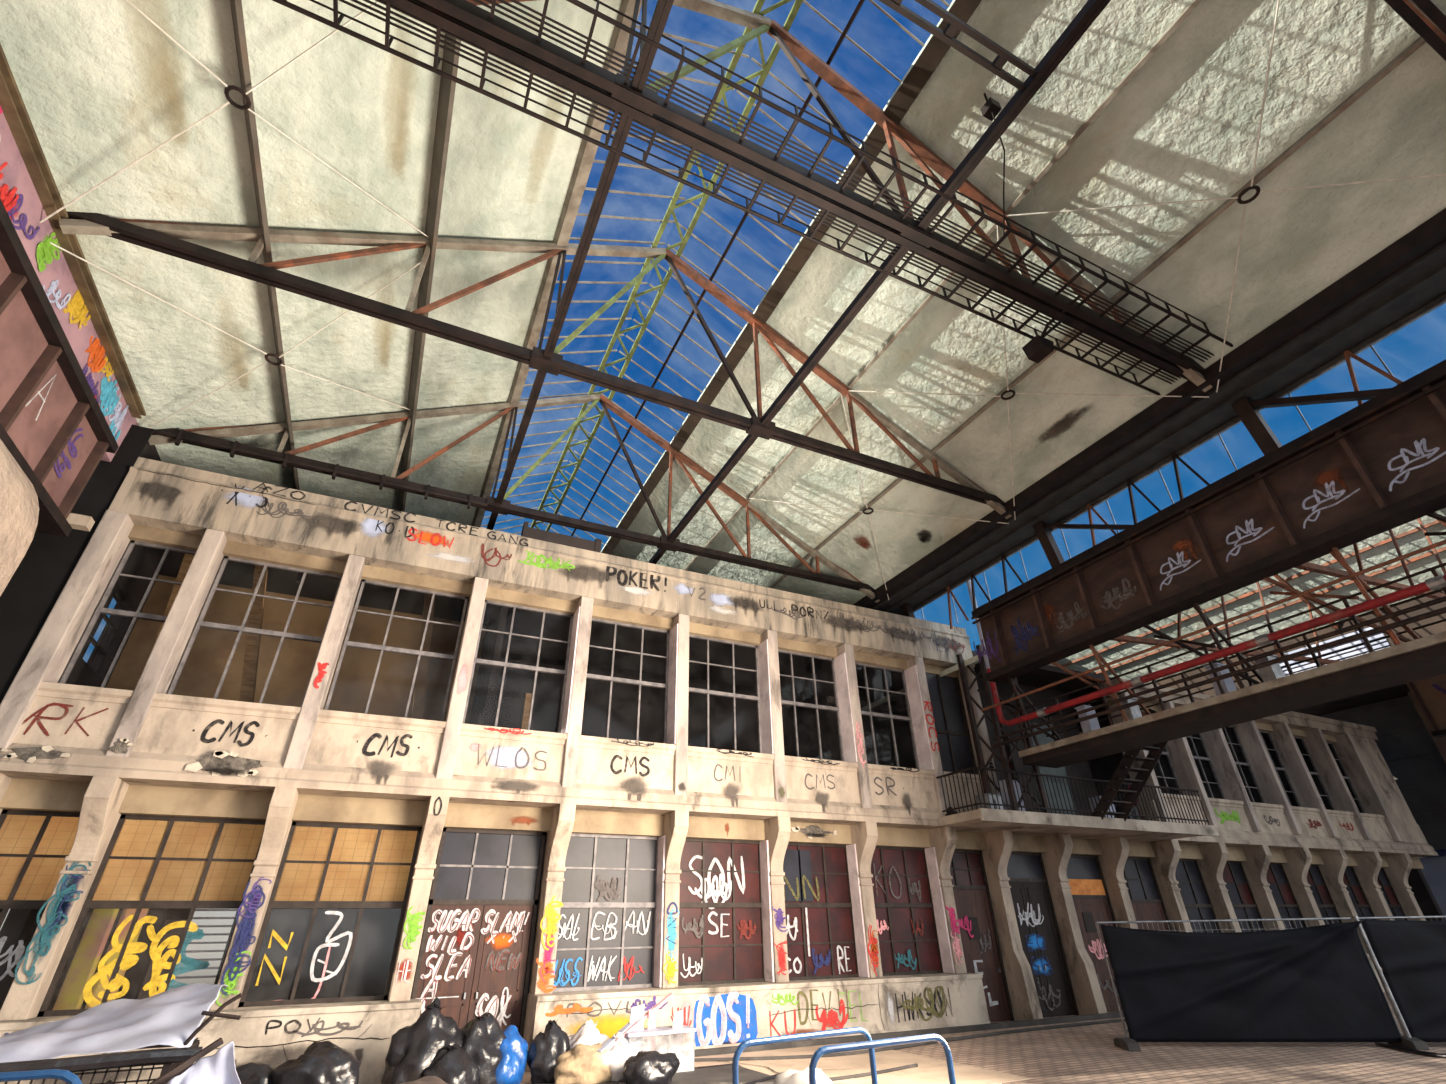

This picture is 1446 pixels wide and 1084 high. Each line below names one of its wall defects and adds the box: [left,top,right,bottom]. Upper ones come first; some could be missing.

damp [1040,407,1087,441]
spalling [184,751,263,778]